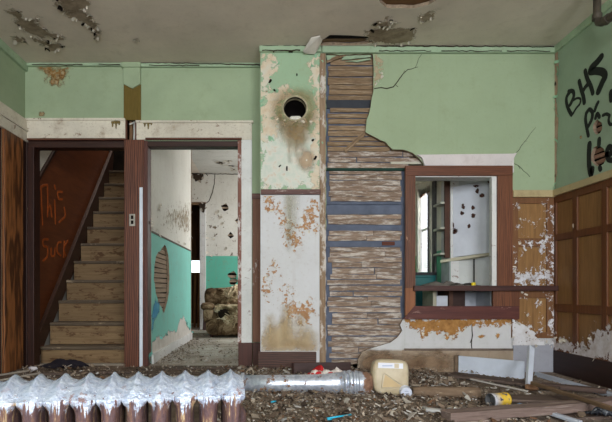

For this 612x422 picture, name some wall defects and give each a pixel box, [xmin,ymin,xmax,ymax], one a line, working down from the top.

peeling [4,8,67,53]
peeling [53,0,102,41]
crack [374,45,554,89]
flaking render [260,8,612,364]
flaking render [154,246,167,310]
peeling [149,316,194,363]
leakage [261,317,315,351]